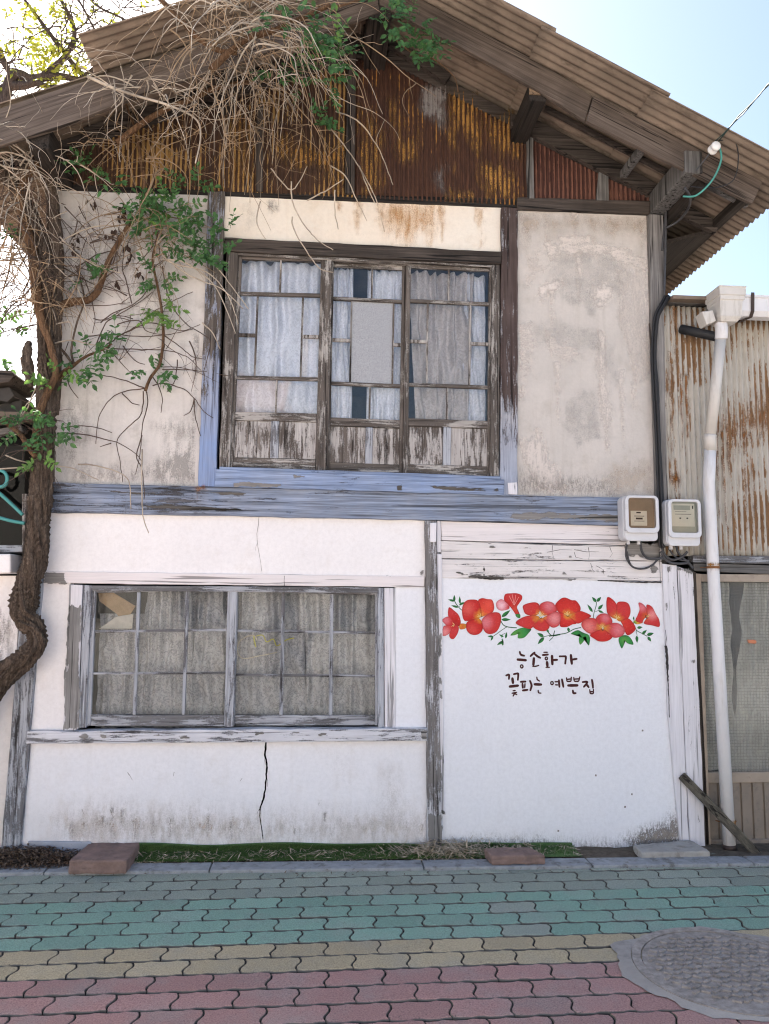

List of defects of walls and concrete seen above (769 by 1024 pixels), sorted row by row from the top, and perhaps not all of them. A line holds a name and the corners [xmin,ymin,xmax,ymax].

rust [665,351,689,437]
rust [716,402,768,500]
peeling [110,482,281,511]
peeling [456,568,504,580]
peeling [624,542,693,574]
crack [257,742,268,838]
leakage [631,819,679,846]